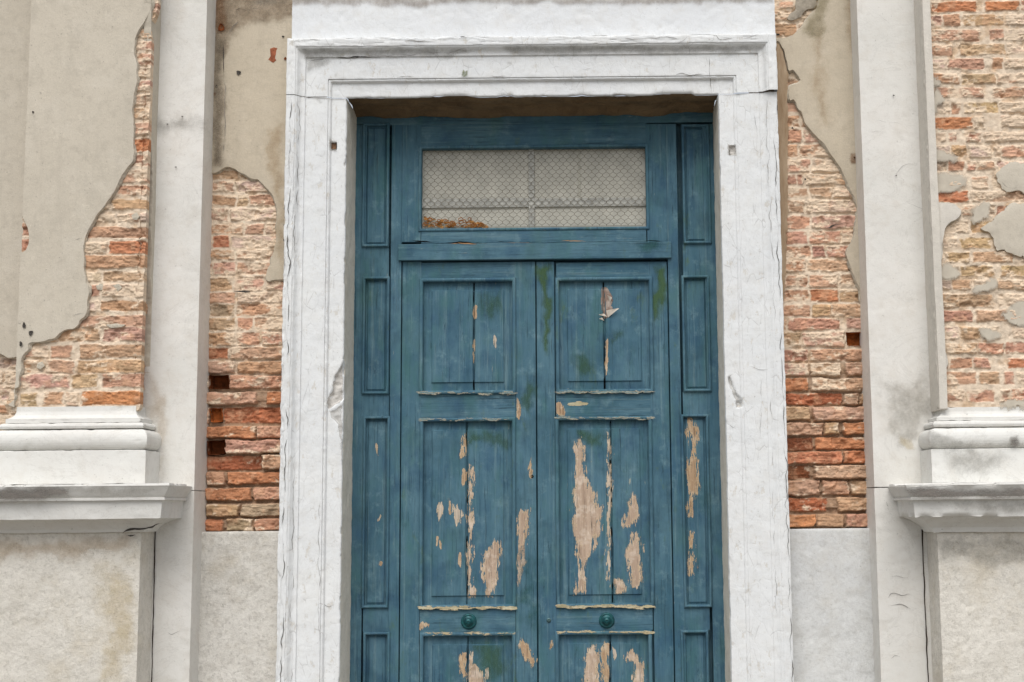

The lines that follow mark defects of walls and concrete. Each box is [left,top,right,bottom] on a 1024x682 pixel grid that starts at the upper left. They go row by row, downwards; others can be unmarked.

peeling [0,0,161,431]
peeling [205,167,284,532]
peeling [599,287,619,320]
peeling [774,0,868,529]
peeling [930,0,1024,411]
crack [123,523,161,537]
peeling [436,433,503,598]
peeling [516,509,531,584]
peeling [569,432,645,596]
peeling [685,417,700,518]
peeling [459,651,489,682]
peeling [581,641,645,682]